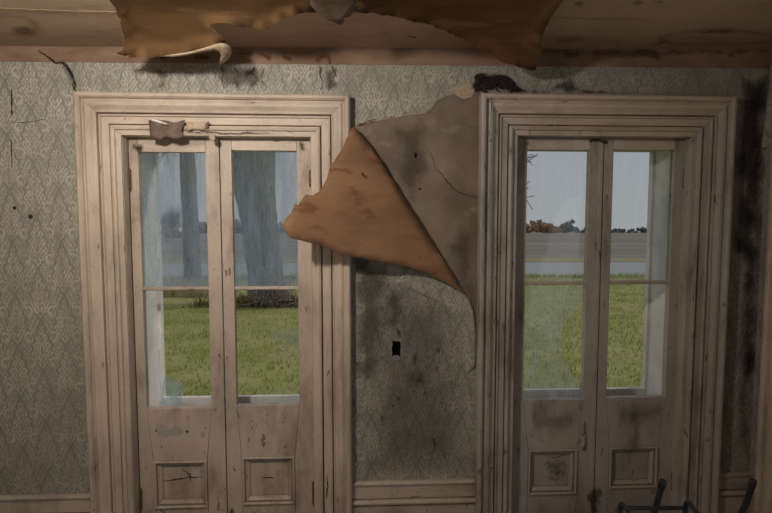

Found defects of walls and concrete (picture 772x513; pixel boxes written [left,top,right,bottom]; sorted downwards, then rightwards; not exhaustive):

crack [39,51,76,91]
leakage [213,67,264,89]
leakage [473,73,537,111]
leakage [736,81,767,288]
flaking render [283,83,480,374]